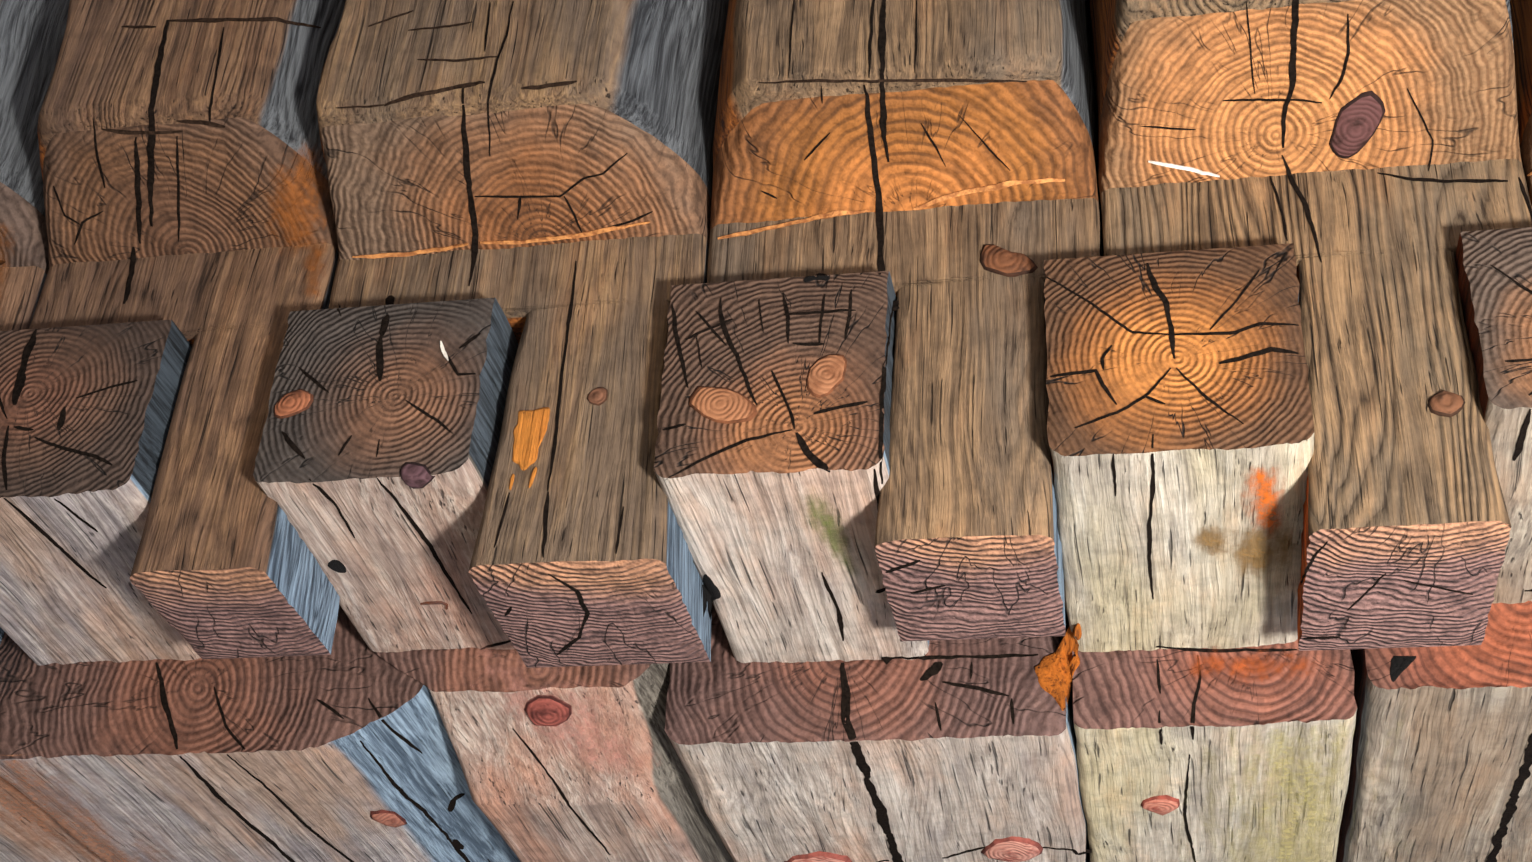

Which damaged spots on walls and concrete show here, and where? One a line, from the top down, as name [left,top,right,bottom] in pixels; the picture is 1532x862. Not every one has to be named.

crack [53,20,224,304]
crack [663,0,1010,511]
crack [1046,0,1350,599]
crack [1377,88,1532,218]
crack [1505,358,1532,461]
crack [875,560,946,594]
crack [155,662,354,862]
crack [822,572,904,862]
crack [881,654,1038,731]
crack [942,847,985,859]
crack [1156,573,1473,862]
crack [1486,734,1532,862]